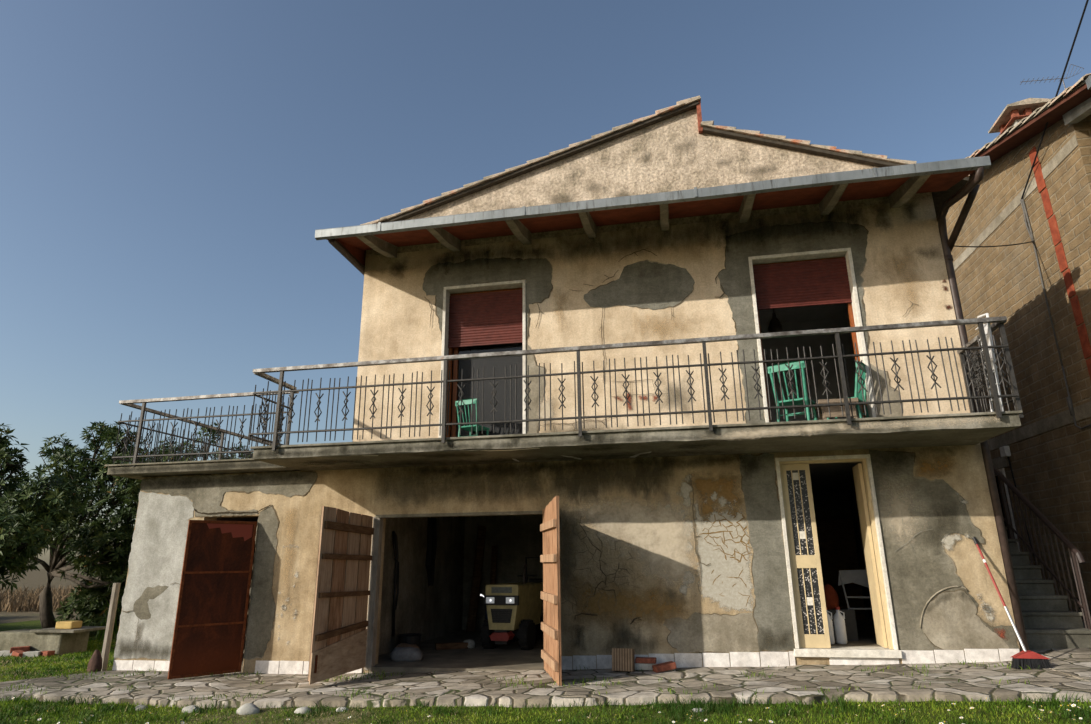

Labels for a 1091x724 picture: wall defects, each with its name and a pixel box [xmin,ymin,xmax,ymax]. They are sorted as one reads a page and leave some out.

peeling [114,491,194,661]
crack [561,518,643,624]
peeling [665,475,753,611]
spalling [942,534,969,550]